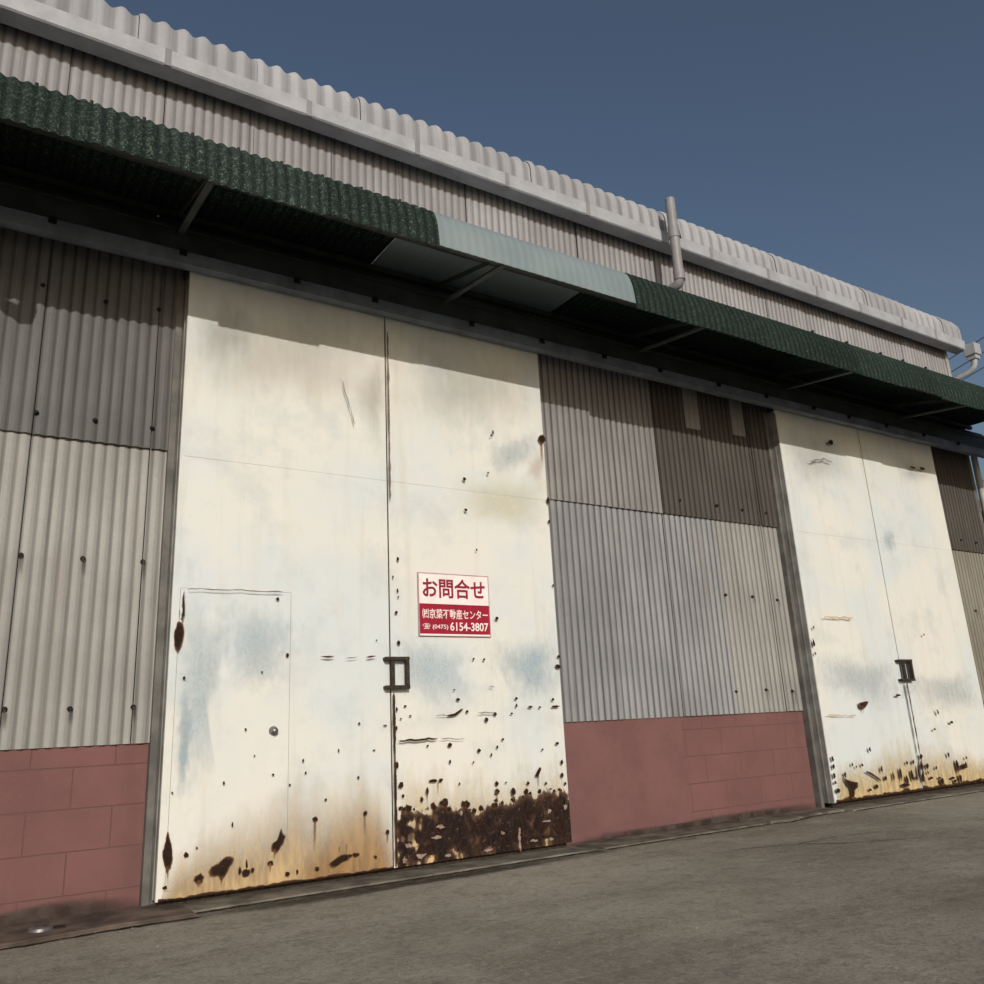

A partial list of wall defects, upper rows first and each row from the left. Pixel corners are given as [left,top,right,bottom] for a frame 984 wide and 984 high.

corrosion [174,588,282,652]
corrosion [158,693,572,902]
corrosion [831,683,984,803]